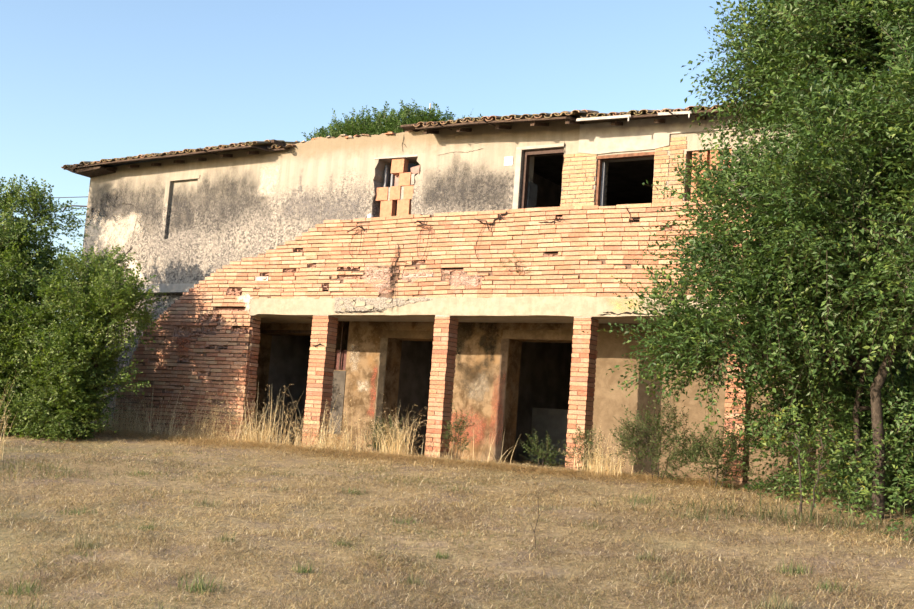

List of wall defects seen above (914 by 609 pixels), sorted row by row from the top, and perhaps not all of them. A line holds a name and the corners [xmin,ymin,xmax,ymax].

damp [90,191,162,225]
damp [172,183,264,228]
damp [426,173,509,207]
spalling [227,287,243,295]
peeling [254,272,270,289]
spalling [323,261,482,313]
spalling [173,308,248,362]
damp [455,322,499,394]